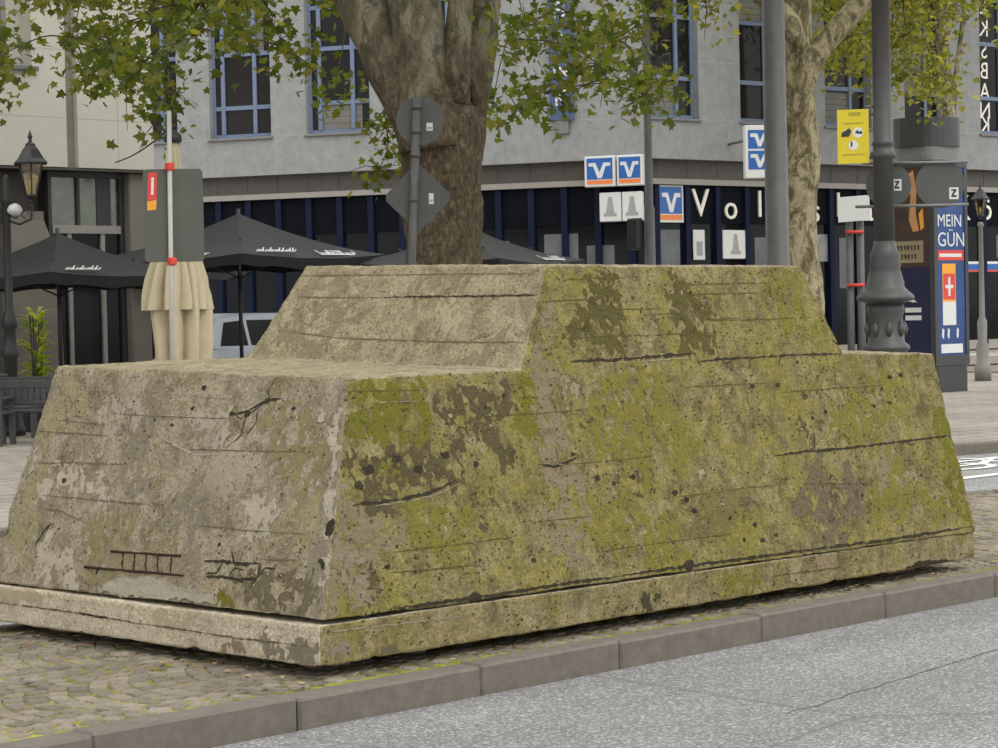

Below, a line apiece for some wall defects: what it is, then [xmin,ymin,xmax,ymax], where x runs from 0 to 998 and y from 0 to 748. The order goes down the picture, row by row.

leakage [562,270,628,361]
leakage [663,267,719,365]
crack [223,380,283,448]
leakage [432,378,518,475]
crack [353,480,456,506]
leakage [792,437,895,553]
crack [204,550,302,588]